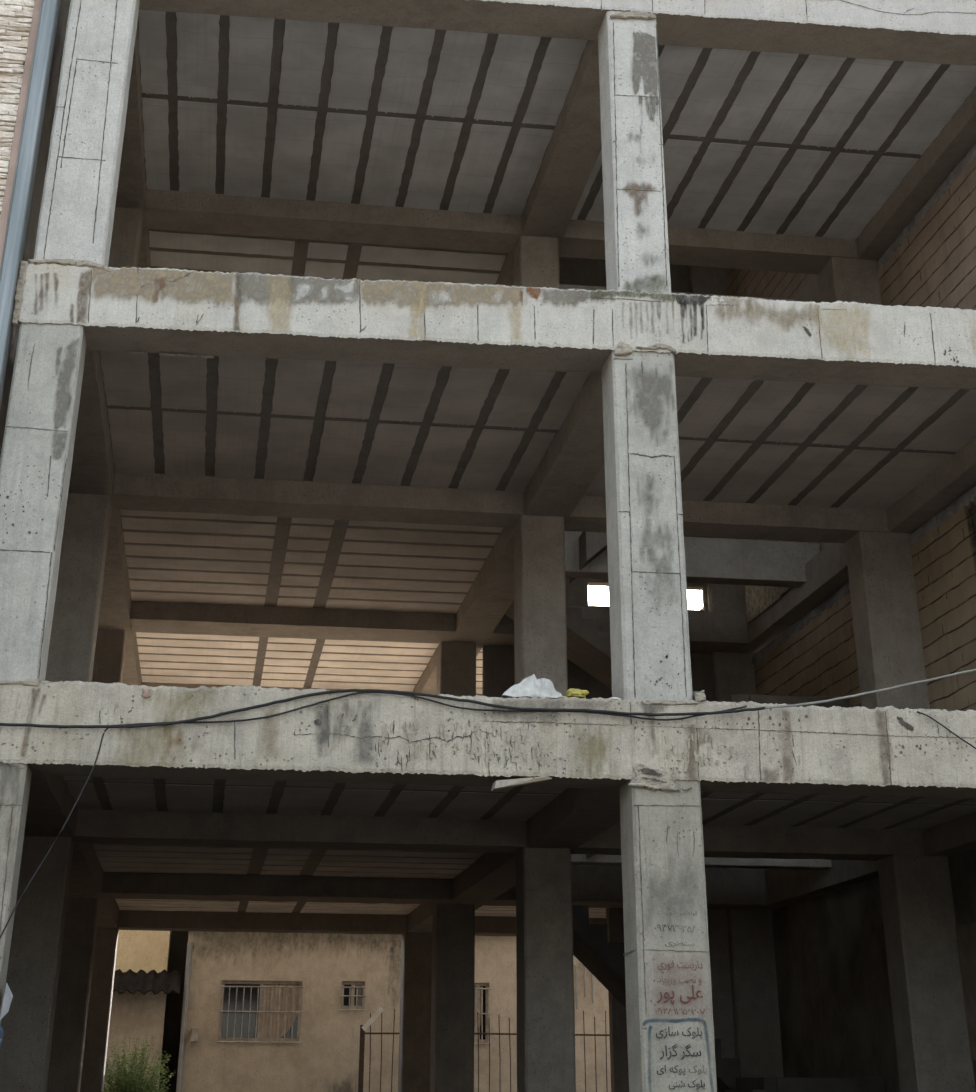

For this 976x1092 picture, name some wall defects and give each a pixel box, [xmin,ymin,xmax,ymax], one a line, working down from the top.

crack [841,0,963,15]
water stain [632,32,658,121]
water stain [70,273,90,322]
water stain [626,276,662,292]
water stain [672,294,734,342]
water stain [53,342,76,459]
water stain [636,371,674,431]
crack [293,719,975,778]